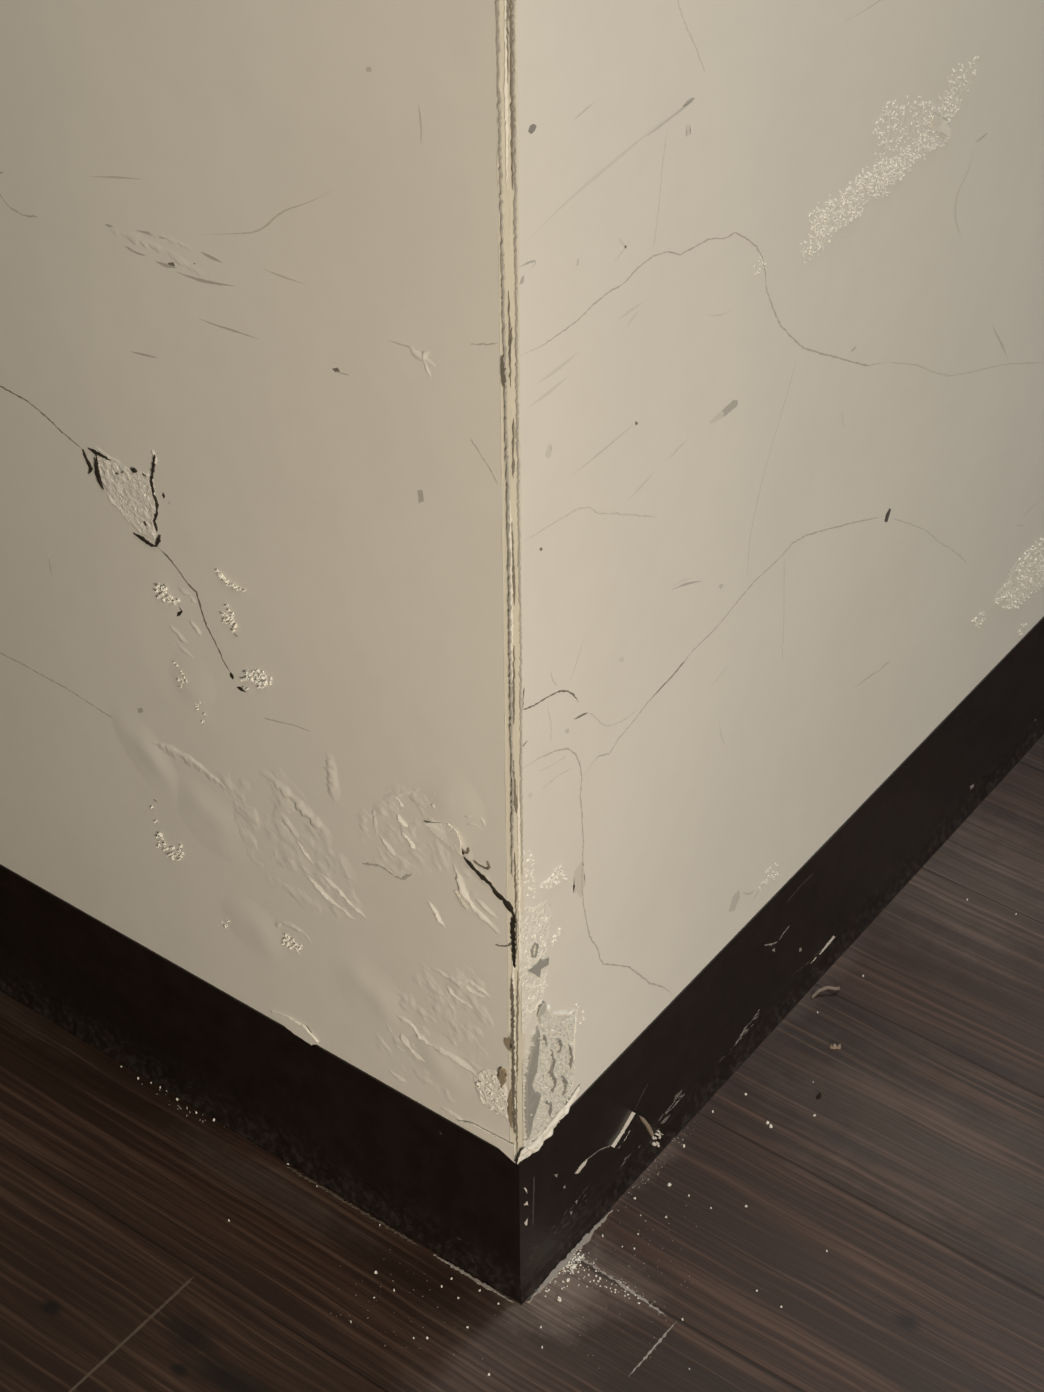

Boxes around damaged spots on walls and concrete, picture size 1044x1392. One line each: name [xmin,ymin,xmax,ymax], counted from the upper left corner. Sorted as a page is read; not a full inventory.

spalling [800,56,979,263]
crack [0,386,111,489]
peeling [94,445,170,541]
peeling [155,583,183,616]
crack [133,455,235,672]
peeling [215,569,246,637]
crack [455,0,1039,1155]
spalling [971,537,1044,636]
crack [0,653,111,717]
peeling [230,669,272,692]
flaking render [473,850,585,1164]